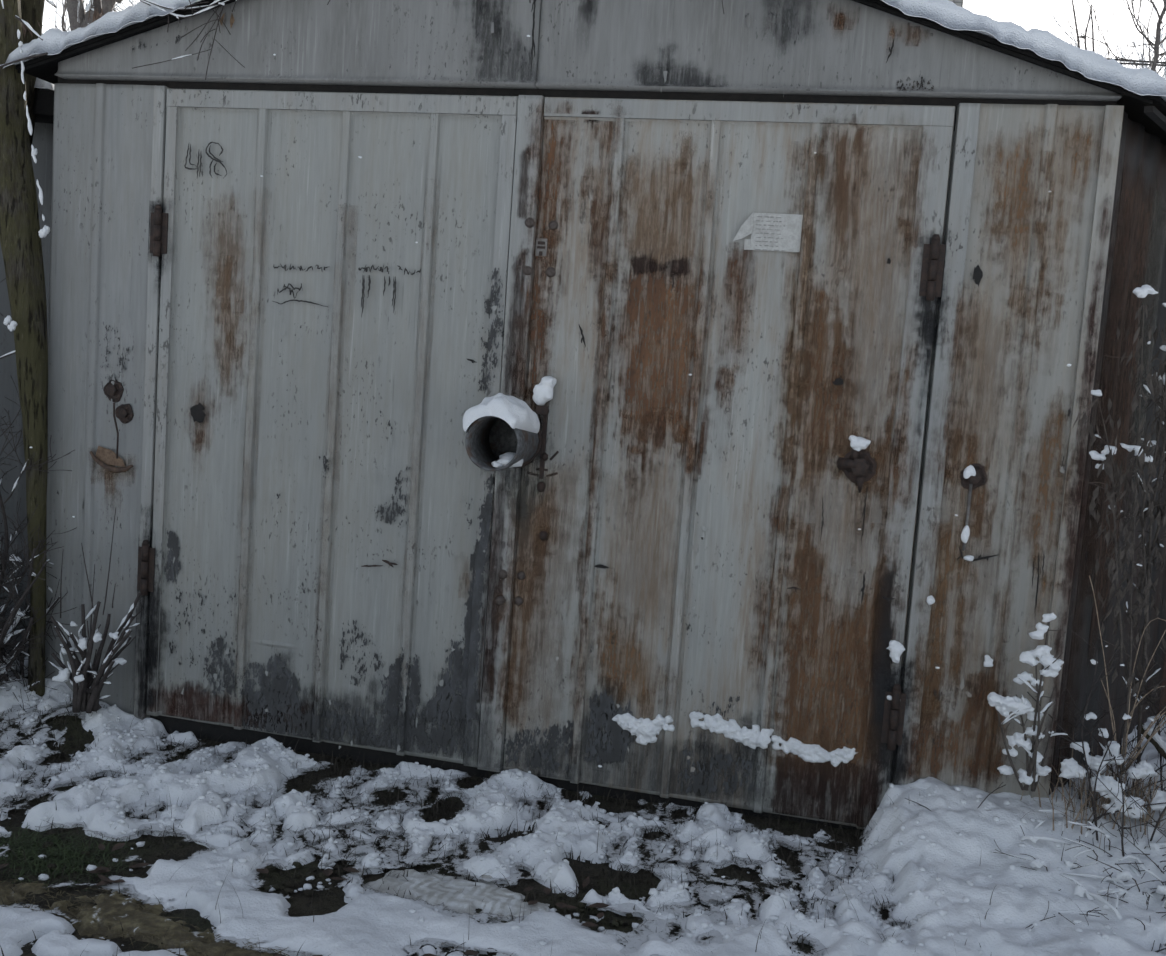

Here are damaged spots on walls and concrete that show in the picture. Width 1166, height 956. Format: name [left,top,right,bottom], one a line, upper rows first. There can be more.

corrosion [216,202,244,378]
corrosion [505,102,753,707]
leakage [638,65,722,87]
corrosion [780,128,912,510]
corrosion [952,303,976,379]
corrosion [989,134,1067,316]
corrosion [1061,127,1103,187]
corrosion [146,682,314,732]
corrosion [477,479,556,710]
leakage [525,713,758,800]
corrosion [754,487,894,827]
corrosion [904,396,1007,784]